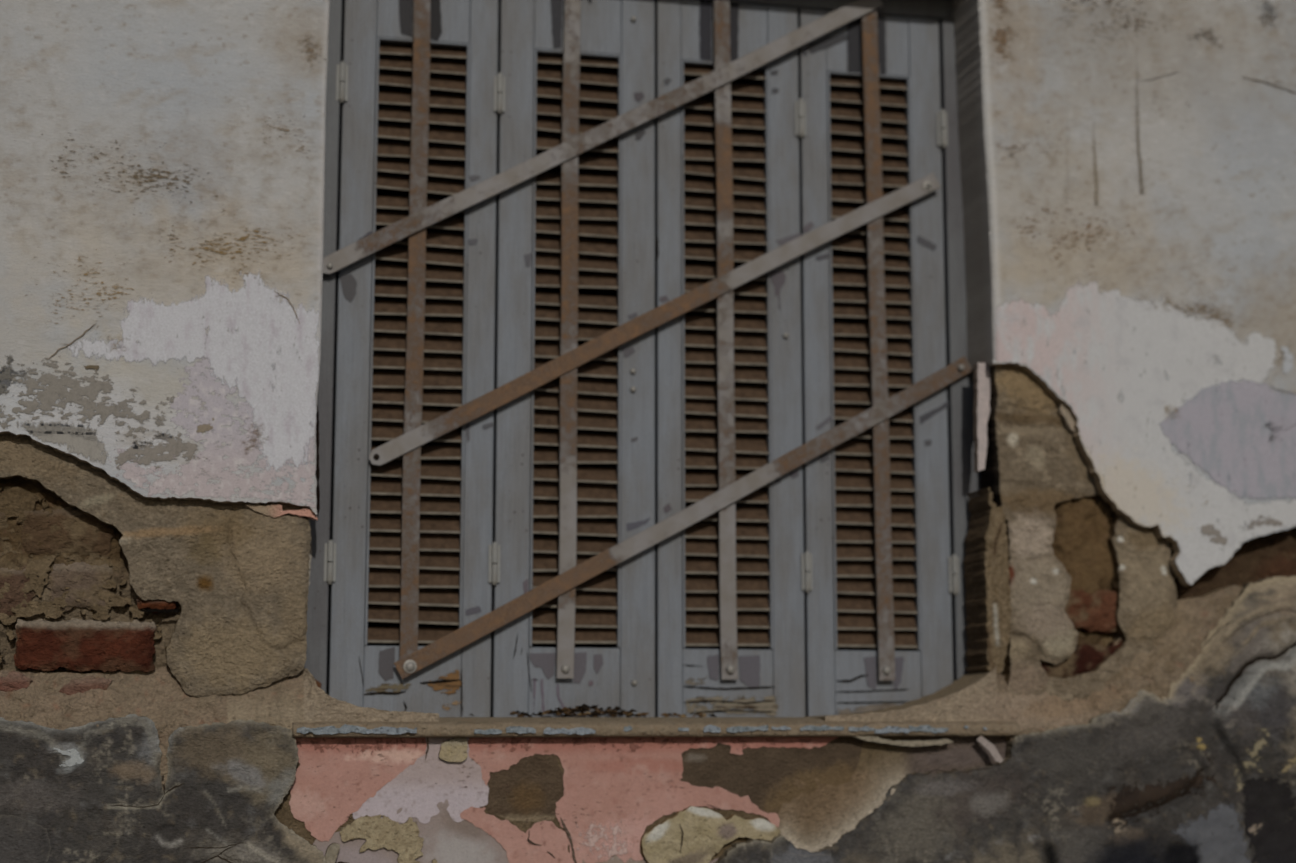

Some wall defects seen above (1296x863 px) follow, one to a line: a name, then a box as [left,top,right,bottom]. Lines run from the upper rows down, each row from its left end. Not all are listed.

flaking render [0,270,320,698]
flaking render [963,281,1296,701]
peeling [296,724,596,863]
flaking render [582,725,953,863]